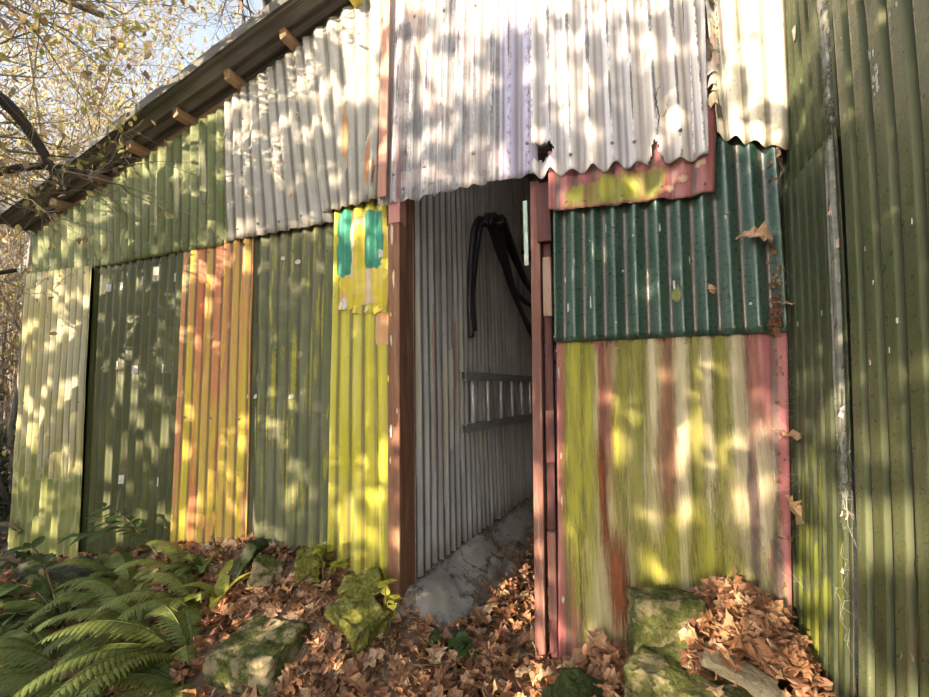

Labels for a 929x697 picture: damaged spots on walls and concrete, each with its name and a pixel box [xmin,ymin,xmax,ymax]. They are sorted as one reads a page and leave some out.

crack [655,87,668,134]
peeling [816,0,849,548]
corrosion [597,441,630,641]